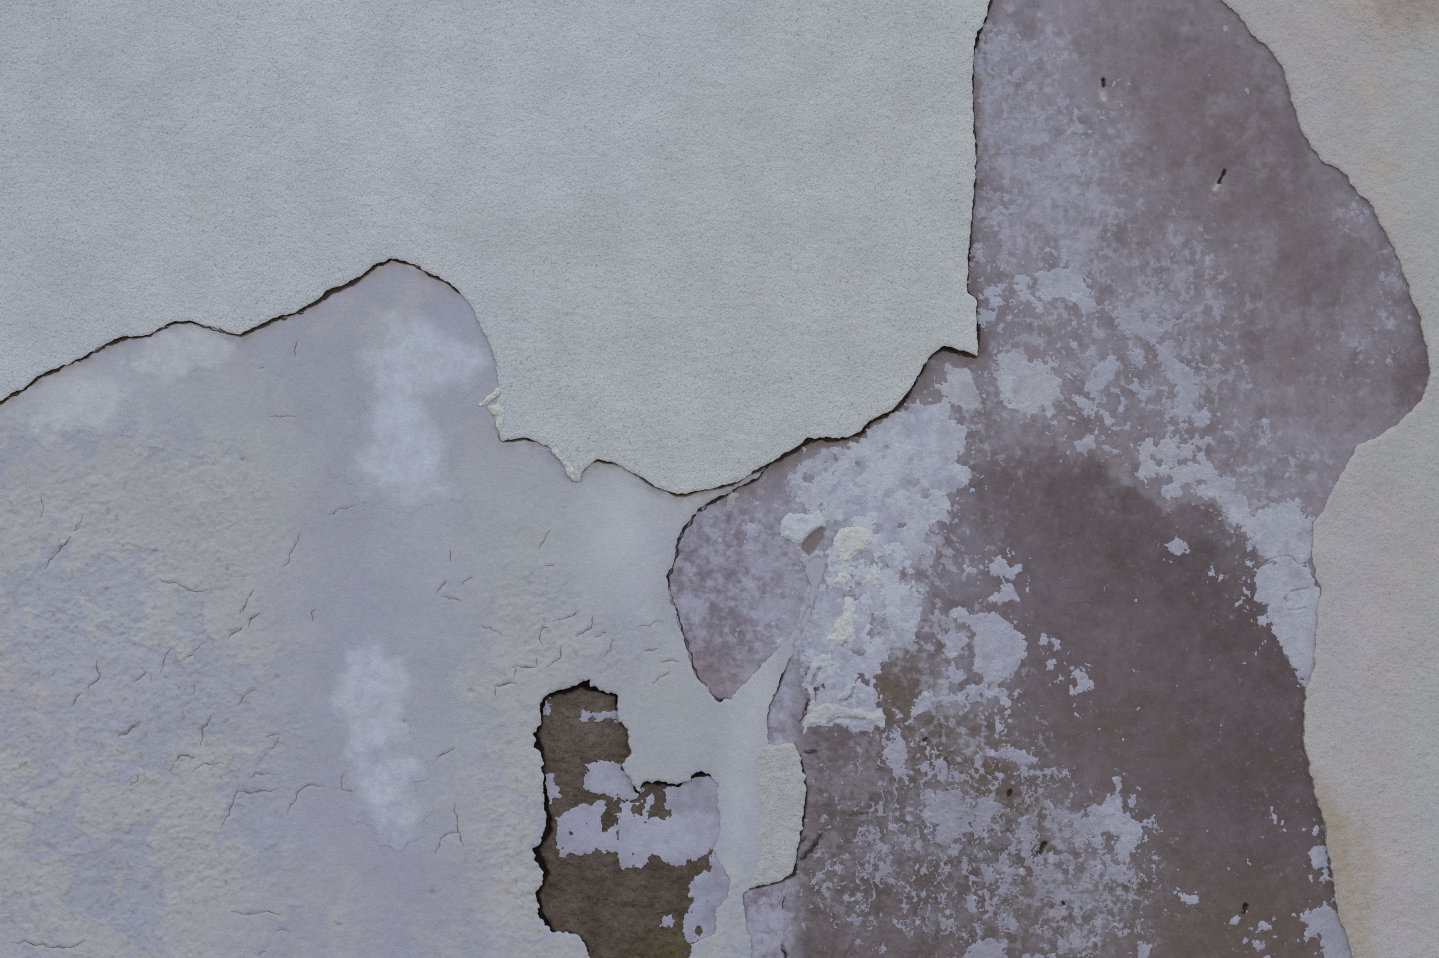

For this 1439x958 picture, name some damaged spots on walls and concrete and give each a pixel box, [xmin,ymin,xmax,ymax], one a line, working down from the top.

crack [46,516,83,567]
crack [72,590,349,829]
spalling [0,259,806,958]
crack [435,803,464,853]
spalling [666,0,1430,958]